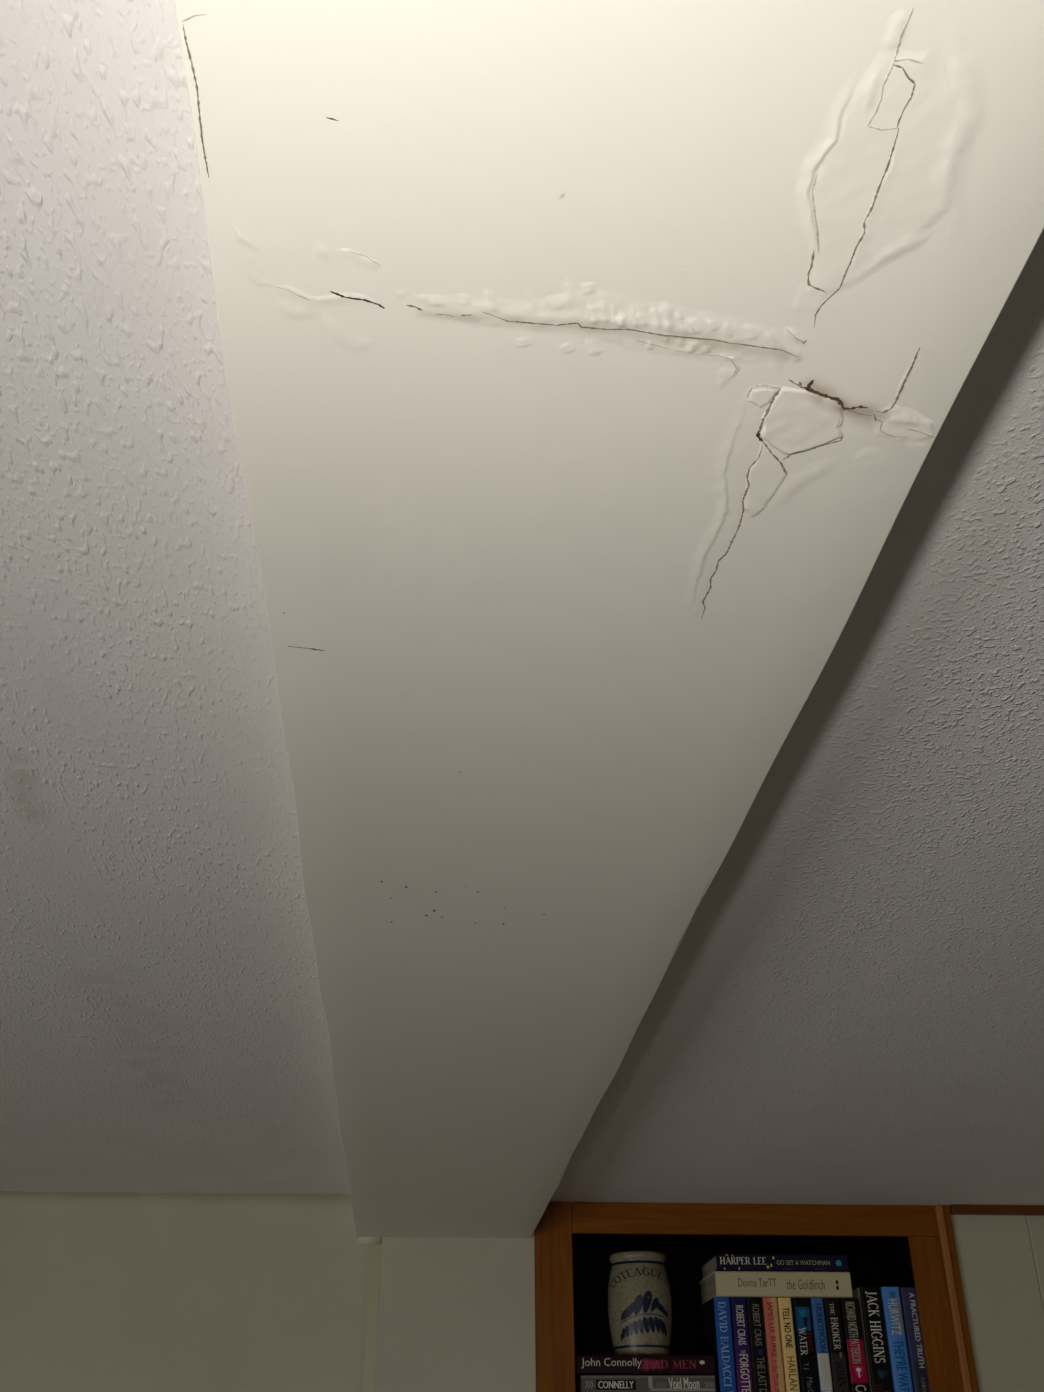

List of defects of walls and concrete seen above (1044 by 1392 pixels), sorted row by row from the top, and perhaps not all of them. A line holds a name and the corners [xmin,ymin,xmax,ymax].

crack [182,14,209,178]
crack [277,7,936,619]